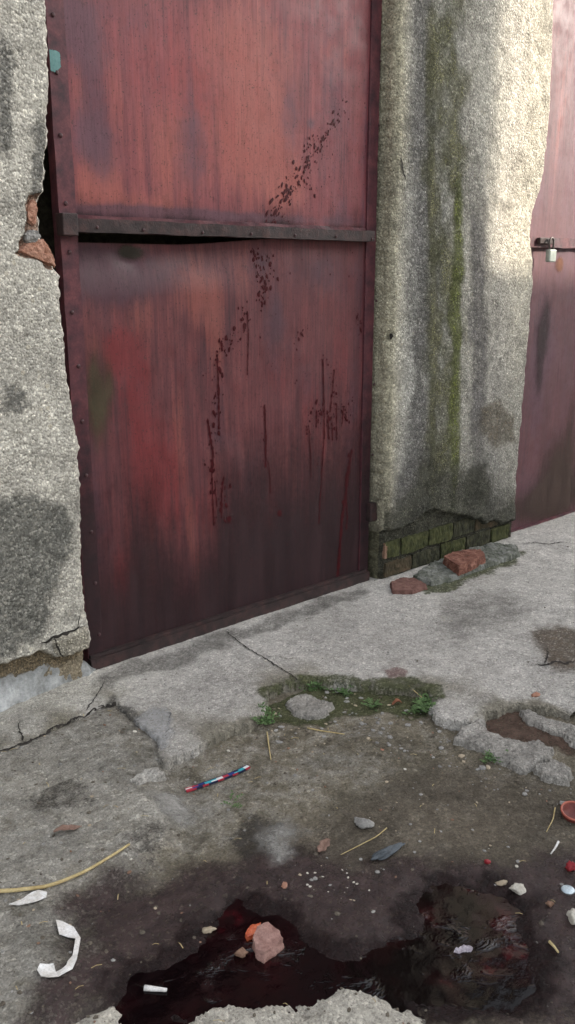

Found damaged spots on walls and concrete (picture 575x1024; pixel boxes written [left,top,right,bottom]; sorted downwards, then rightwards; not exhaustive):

spalling [15,193,56,273]
leakage [306,0,516,577]
leakage [0,494,103,658]
spalling [377,510,515,579]
crack [40,614,87,657]
crack [0,679,116,751]